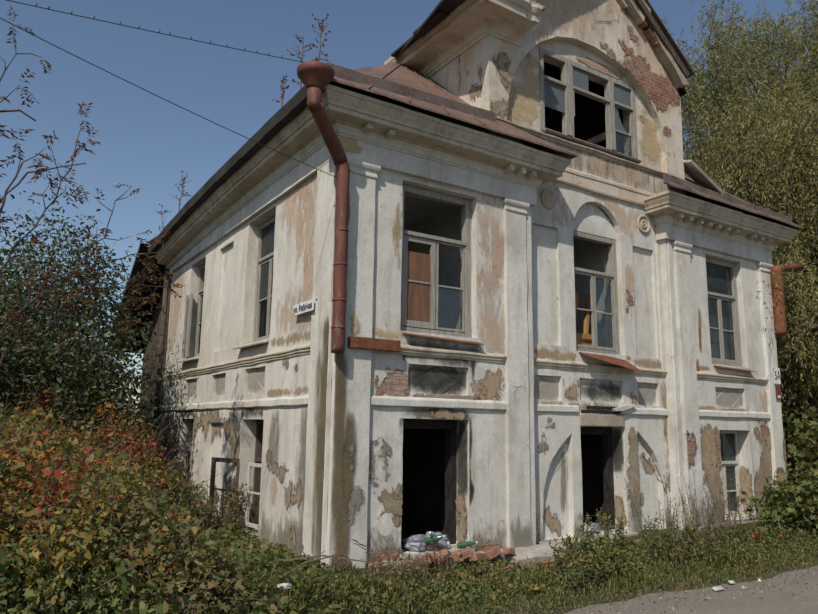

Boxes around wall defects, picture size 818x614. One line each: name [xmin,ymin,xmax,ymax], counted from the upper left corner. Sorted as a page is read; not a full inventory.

peeling [469,67,482,101]
flaking render [577,8,680,160]
peeling [574,151,648,186]
peeling [266,449,302,513]
damp [258,315,356,559]
peeling [347,437,403,527]
peeling [374,367,505,420]
peeling [543,505,561,537]
peeling [614,426,671,528]
peeling [687,423,723,514]
peeling [699,406,749,418]
peeling [740,391,788,515]